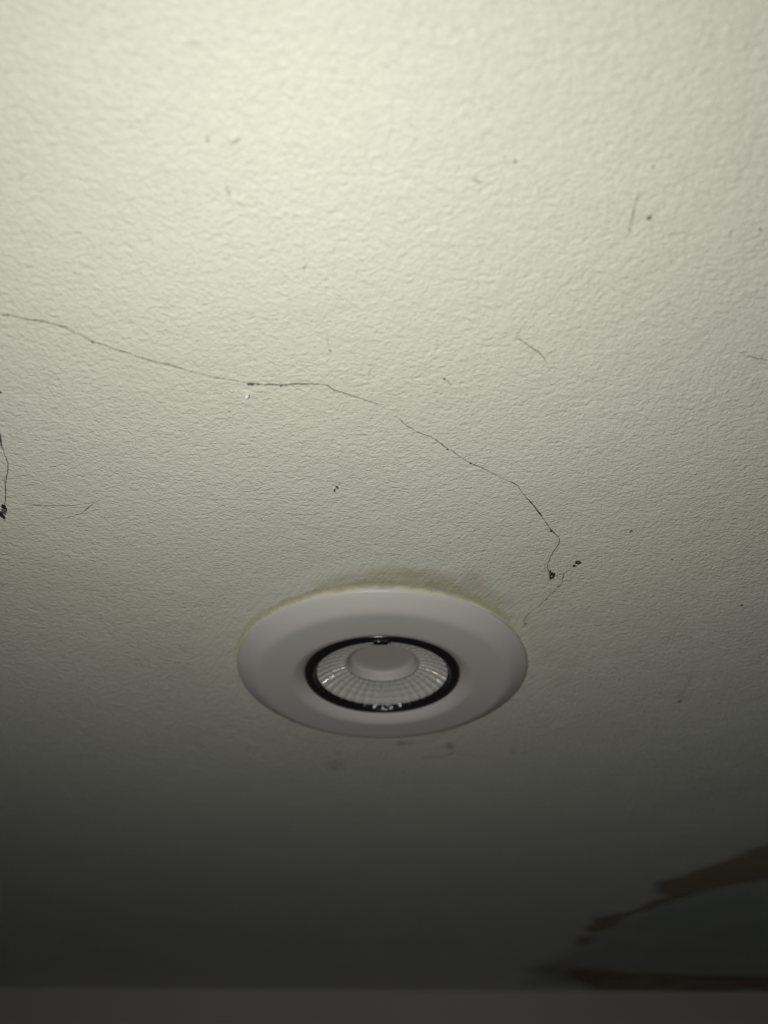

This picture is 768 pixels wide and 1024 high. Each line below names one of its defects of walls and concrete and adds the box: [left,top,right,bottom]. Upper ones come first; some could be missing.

crack [0,434,8,519]
crack [401,420,581,599]